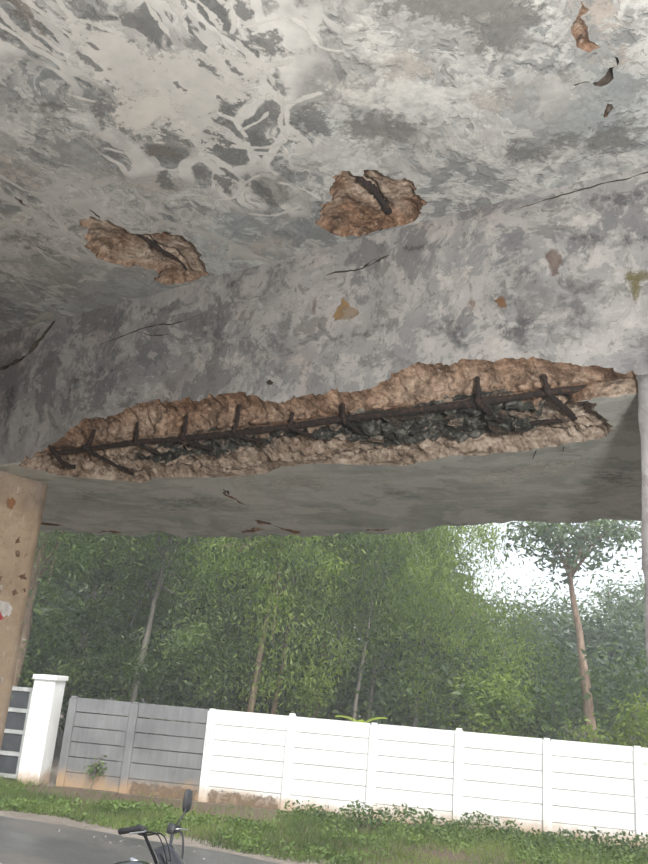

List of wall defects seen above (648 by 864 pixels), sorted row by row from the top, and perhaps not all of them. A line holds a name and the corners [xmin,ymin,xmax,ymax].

leakage [376,0,546,61]
spalling [571,1,600,52]
leakage [0,0,344,270]
leakage [345,109,458,181]
leakage [504,121,648,162]
spalling [315,170,427,237]
crack [520,171,648,208]
spalling [79,210,209,285]
crack [0,321,55,370]
crack [96,312,203,346]
spalling [18,356,638,483]